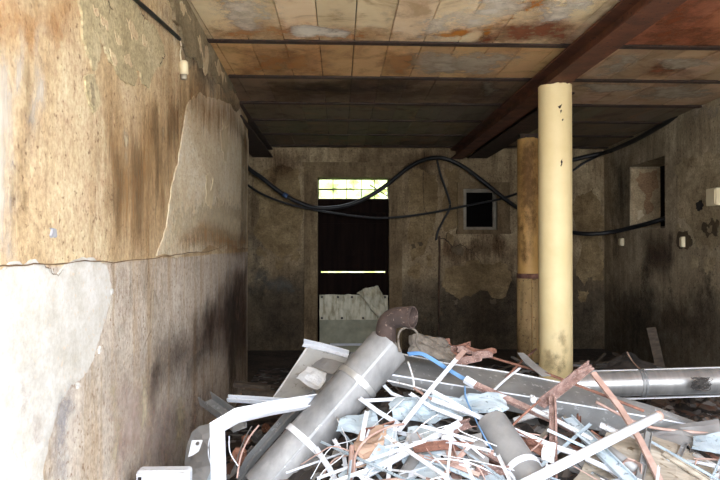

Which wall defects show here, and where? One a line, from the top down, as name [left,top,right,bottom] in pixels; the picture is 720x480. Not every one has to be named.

spalling [77,0,166,113]
water stain [223,1,375,40]
corrosion [479,19,575,43]
water stain [110,122,153,240]
peeling [156,87,304,269]
peeling [674,152,720,275]
peeling [0,257,114,480]
crack [0,244,248,400]
peeling [442,260,512,305]